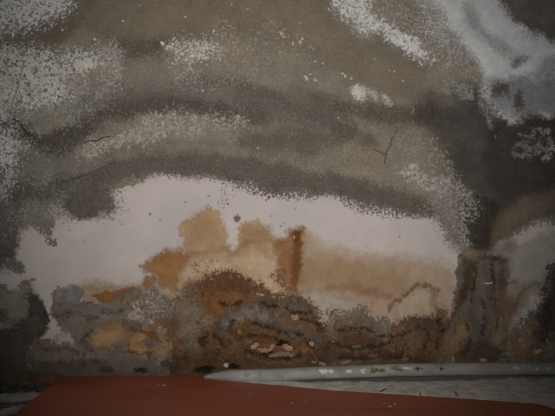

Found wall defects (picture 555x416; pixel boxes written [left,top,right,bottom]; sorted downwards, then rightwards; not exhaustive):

crack [4,65,34,137]
spalling [0,256,452,385]
corrosion [80,207,455,322]
leakage [498,263,555,362]